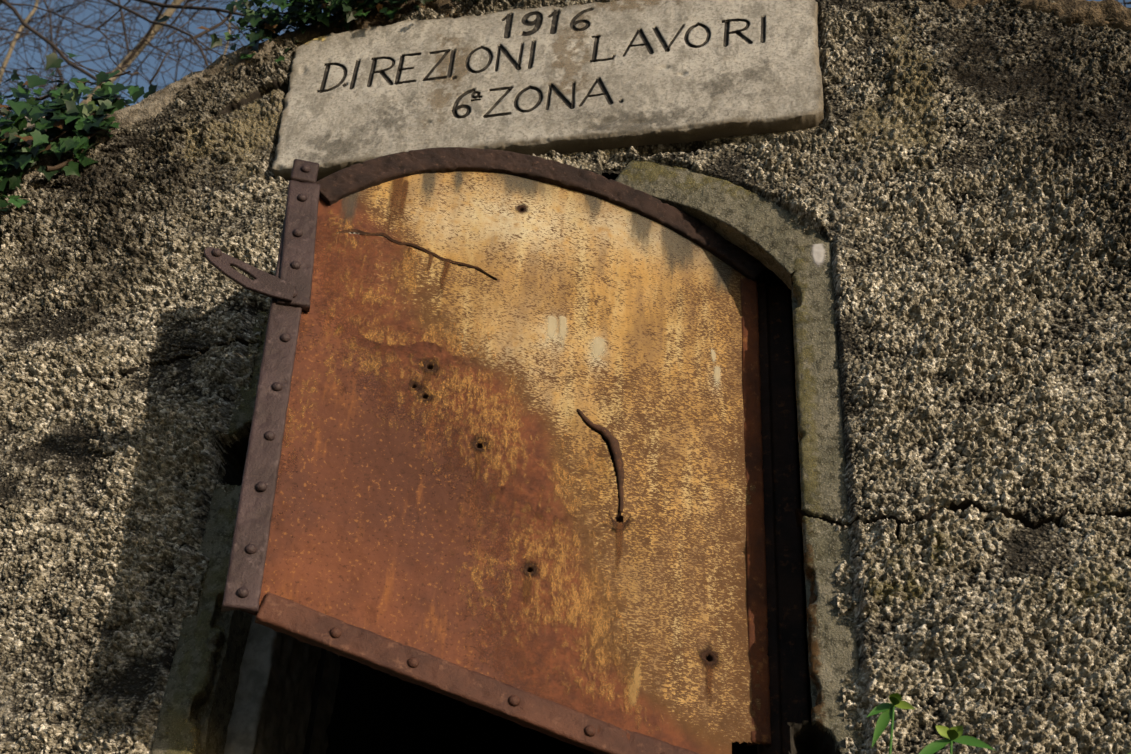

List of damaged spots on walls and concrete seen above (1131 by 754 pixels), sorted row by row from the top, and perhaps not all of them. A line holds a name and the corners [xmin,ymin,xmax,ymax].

corrosion [390,177,409,222]
corrosion [242,222,554,700]
crack [795,499,1131,540]